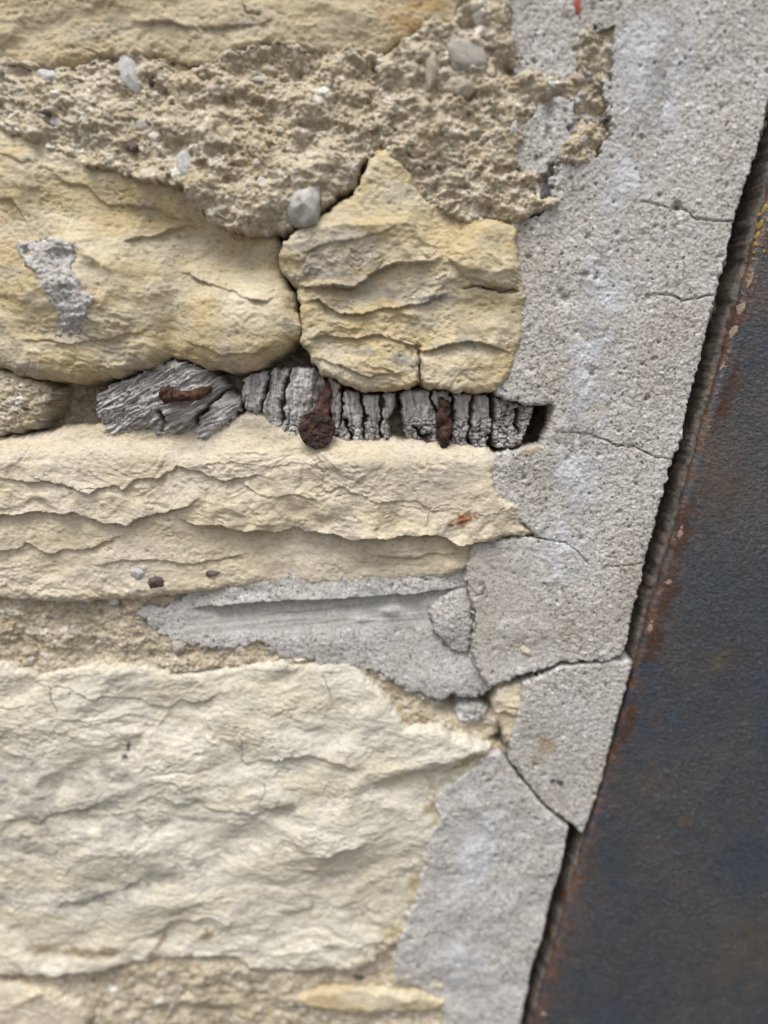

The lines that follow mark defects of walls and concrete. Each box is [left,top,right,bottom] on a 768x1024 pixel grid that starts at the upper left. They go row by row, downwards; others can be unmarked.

crack [643,201,734,222]
corrosion [726,307,741,328]
crack [556,432,668,460]